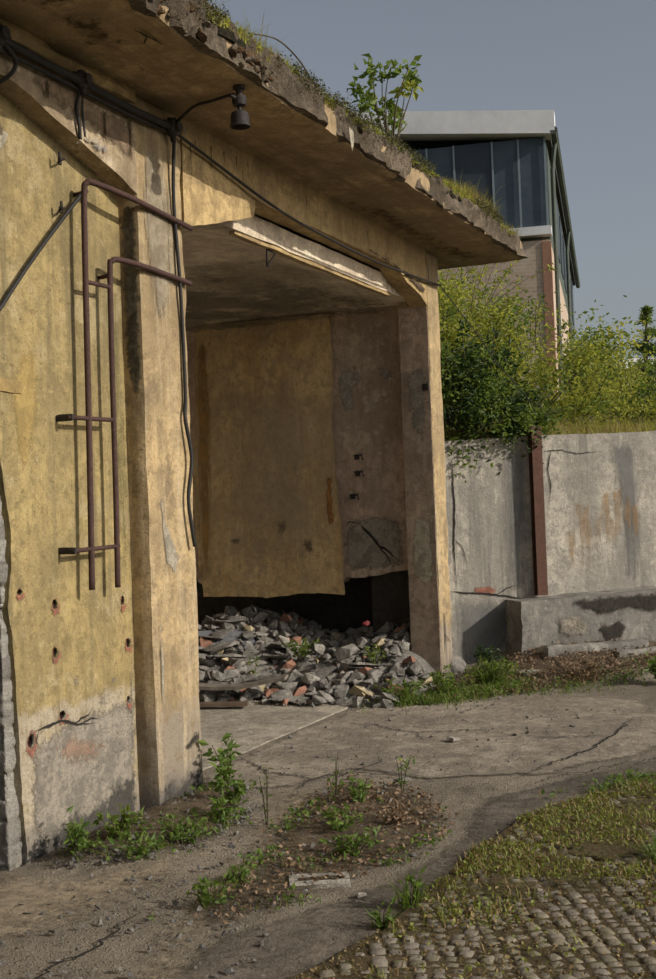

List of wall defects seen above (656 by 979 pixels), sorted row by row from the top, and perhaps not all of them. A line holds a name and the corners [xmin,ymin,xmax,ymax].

crack [346,521,399,567]
crack [36,709,98,745]
crack [239,755,449,790]
crack [350,717,655,791]
crack [34,901,144,979]